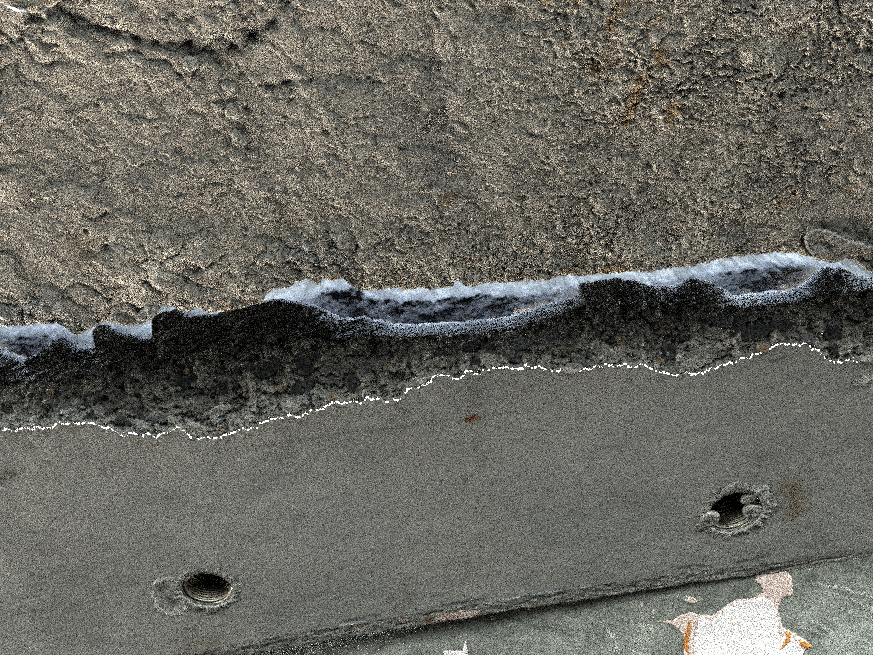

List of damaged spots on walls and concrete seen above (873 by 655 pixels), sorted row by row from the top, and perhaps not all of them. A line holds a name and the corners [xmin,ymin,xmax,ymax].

crack [264,221,873,324]
crack [0,304,219,358]
spalling [0,227,873,439]
peeling [443,640,468,655]
peeling [660,571,812,655]